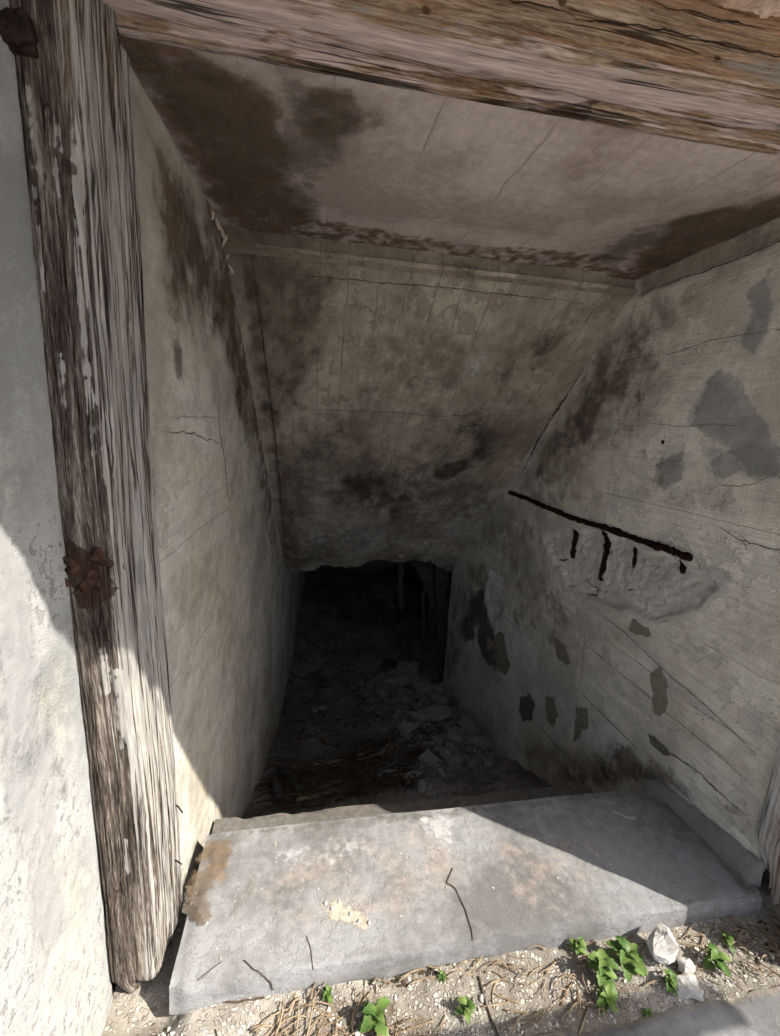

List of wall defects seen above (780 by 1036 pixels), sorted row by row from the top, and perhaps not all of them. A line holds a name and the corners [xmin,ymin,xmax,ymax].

spalling [709,0,780,18]
water stain [129,48,360,235]
water stain [173,189,235,359]
water stain [315,410,498,518]
spalling [508,491,733,638]